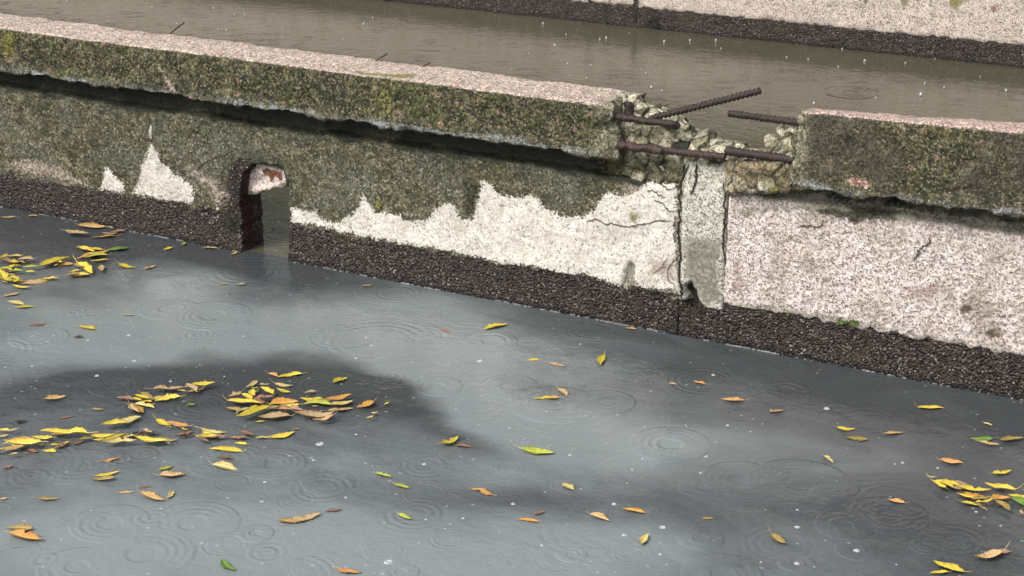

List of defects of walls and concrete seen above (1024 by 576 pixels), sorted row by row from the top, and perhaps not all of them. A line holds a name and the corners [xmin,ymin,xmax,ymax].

peeling [100,144,195,204]
corrosion [241,168,282,247]
peeling [290,166,703,312]
crack [586,164,698,300]
crack [720,182,728,265]